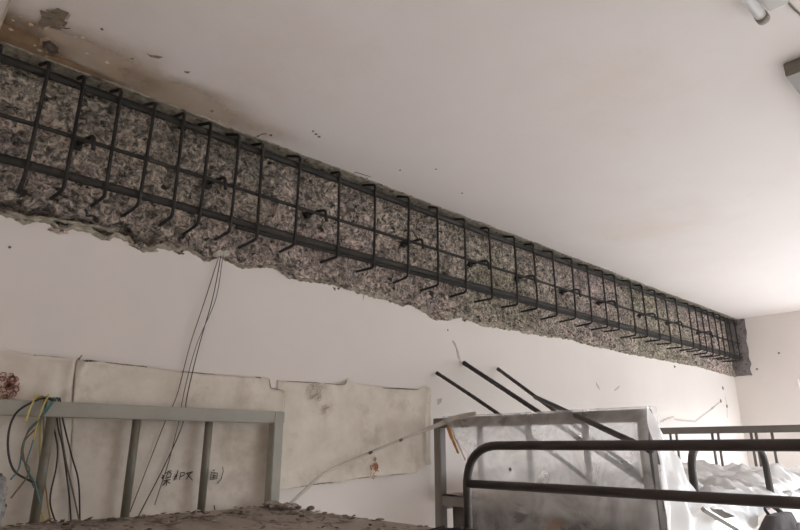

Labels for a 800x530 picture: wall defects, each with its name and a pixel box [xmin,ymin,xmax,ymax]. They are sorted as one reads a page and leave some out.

damp [0,19,113,81]
spalling [0,8,758,377]